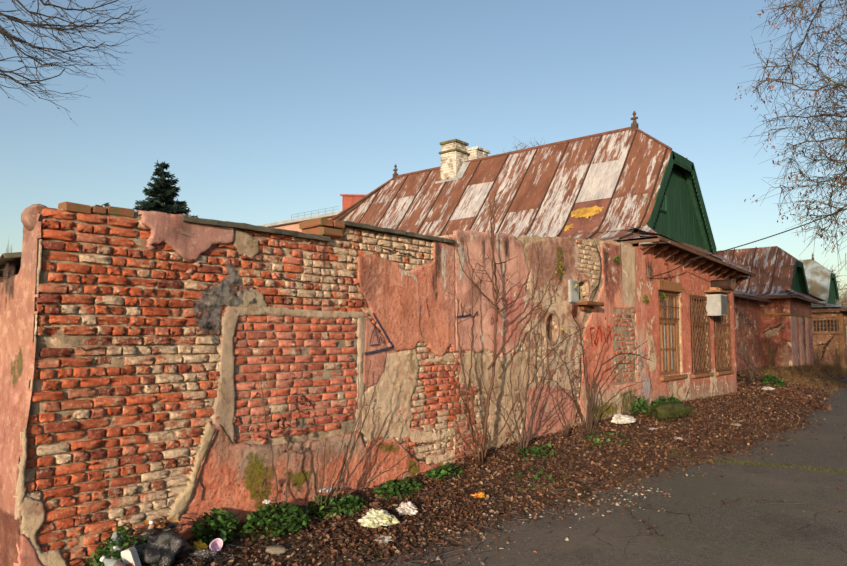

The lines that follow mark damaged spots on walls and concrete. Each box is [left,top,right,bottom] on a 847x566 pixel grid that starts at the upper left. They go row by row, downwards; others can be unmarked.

spalling [13,209,434,566]
peeling [362,236,601,468]